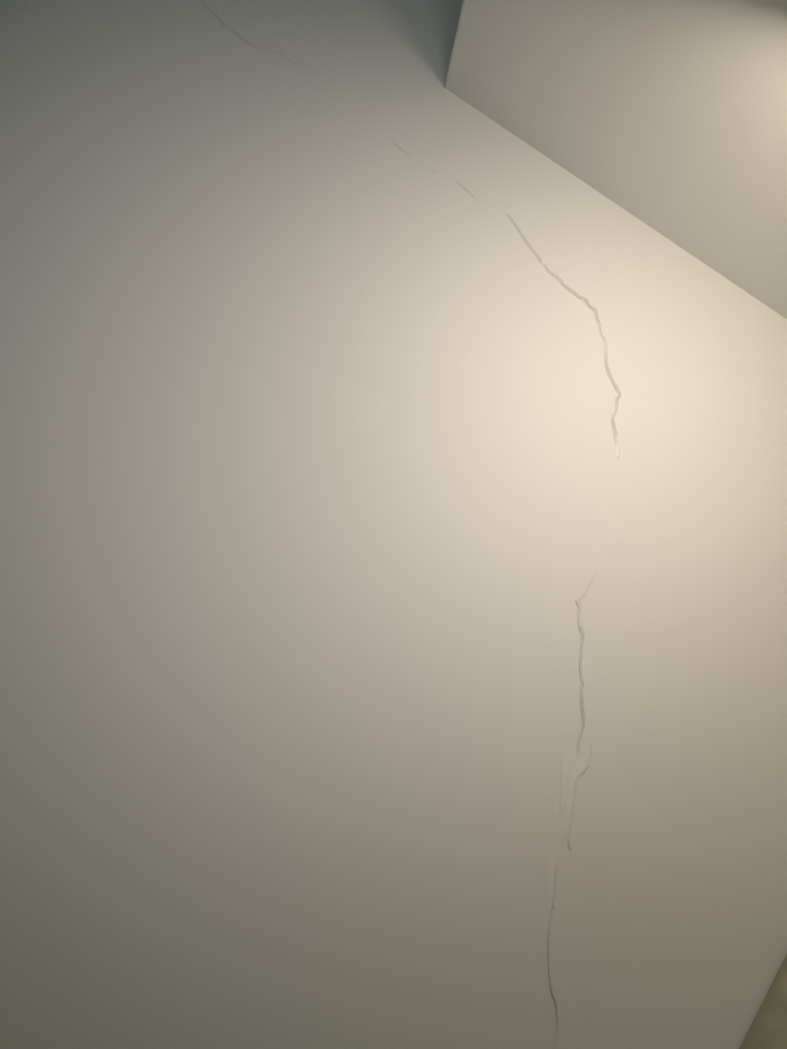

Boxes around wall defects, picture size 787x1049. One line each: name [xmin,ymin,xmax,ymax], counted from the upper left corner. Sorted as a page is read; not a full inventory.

crack [506,213,622,443]
crack [576,568,599,752]